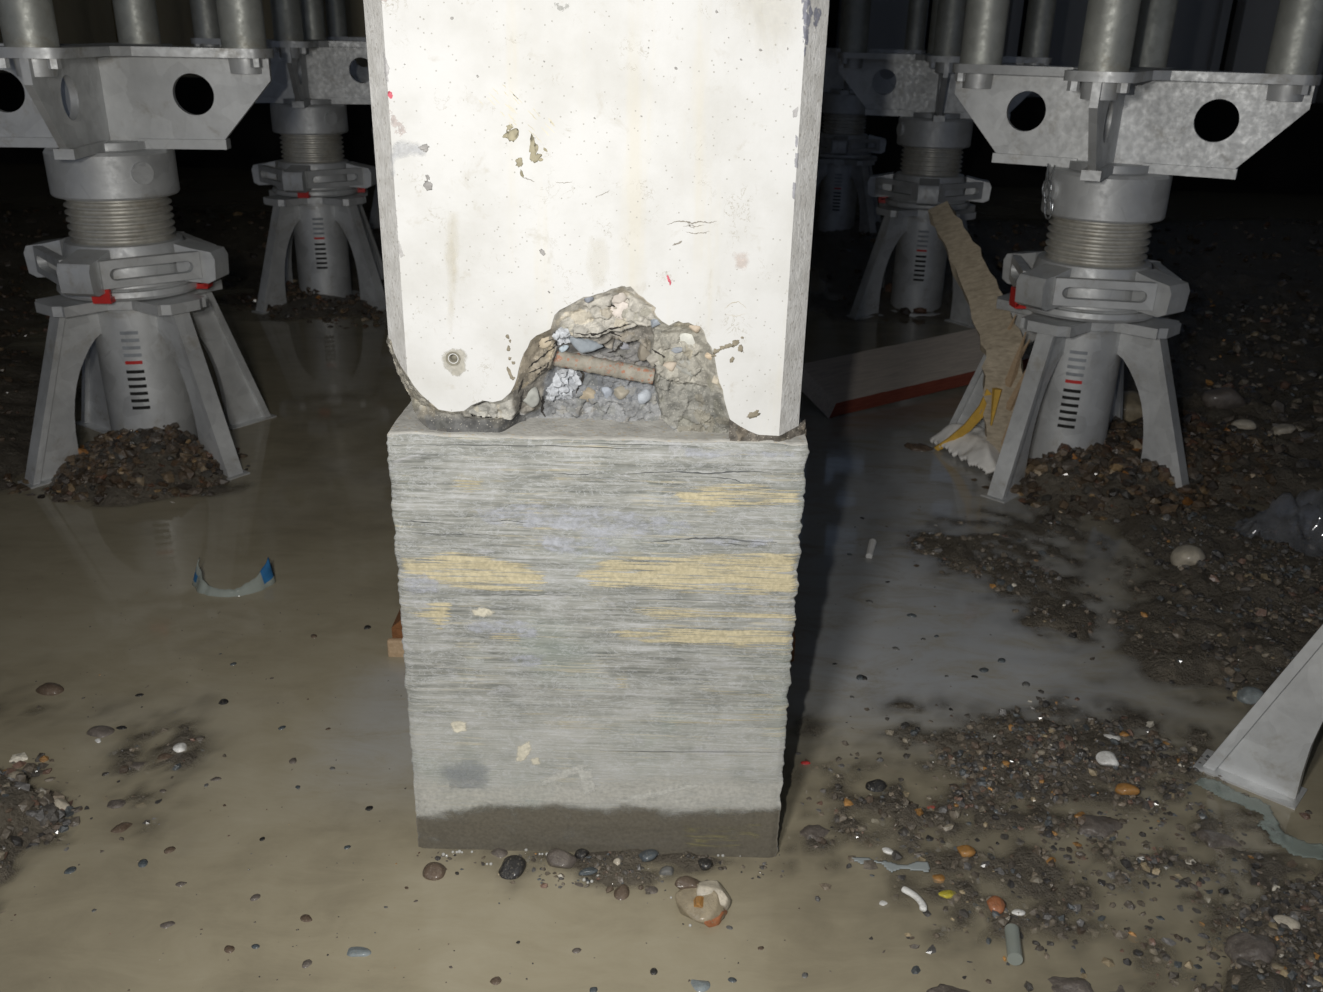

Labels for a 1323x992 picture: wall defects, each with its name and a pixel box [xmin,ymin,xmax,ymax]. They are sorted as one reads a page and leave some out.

spalling [386,286,729,433]
leakage [516,742,540,764]
leakage [416,765,782,861]